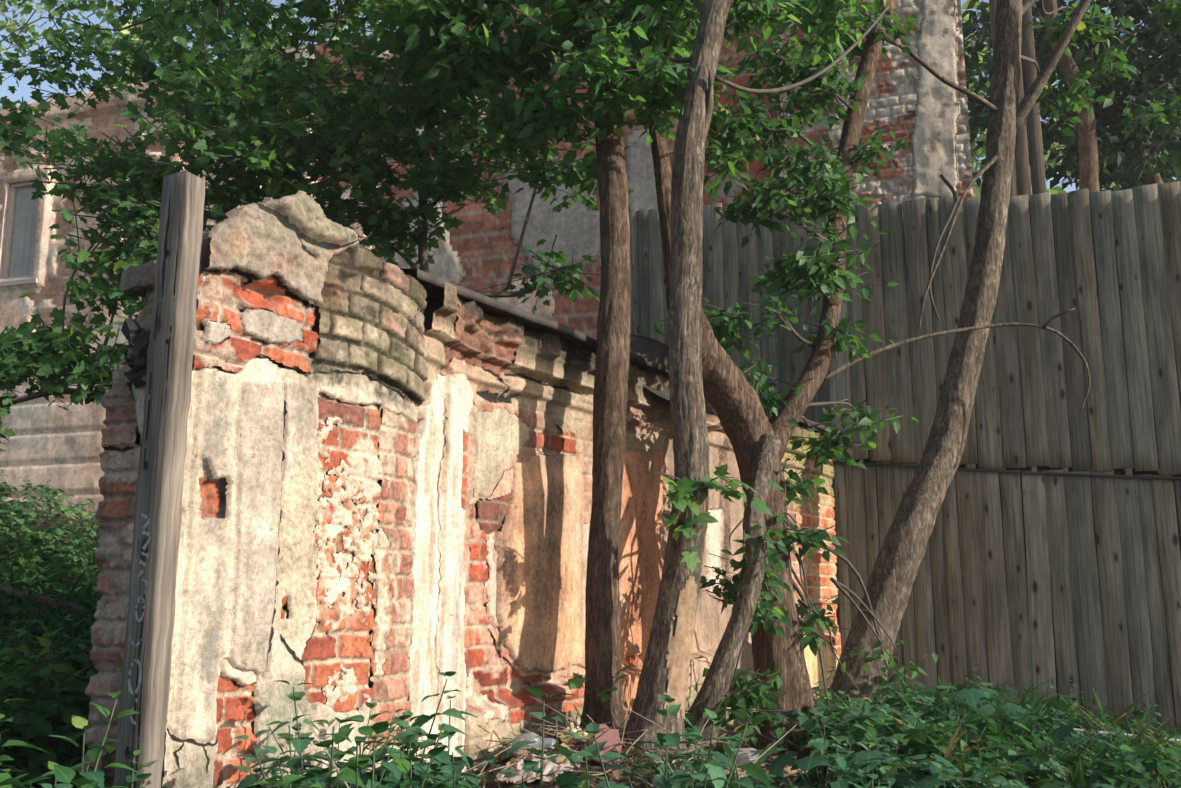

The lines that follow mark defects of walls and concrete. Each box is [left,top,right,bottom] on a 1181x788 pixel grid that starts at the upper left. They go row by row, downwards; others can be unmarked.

crack [240,199,358,258]
spalling [193,271,319,373]
spalling [199,465,221,518]
crack [263,379,316,677]
flaking render [301,393,417,749]
flaking render [461,434,585,724]
flaking render [538,430,577,454]
crack [165,728,218,775]
flaking render [212,659,258,788]